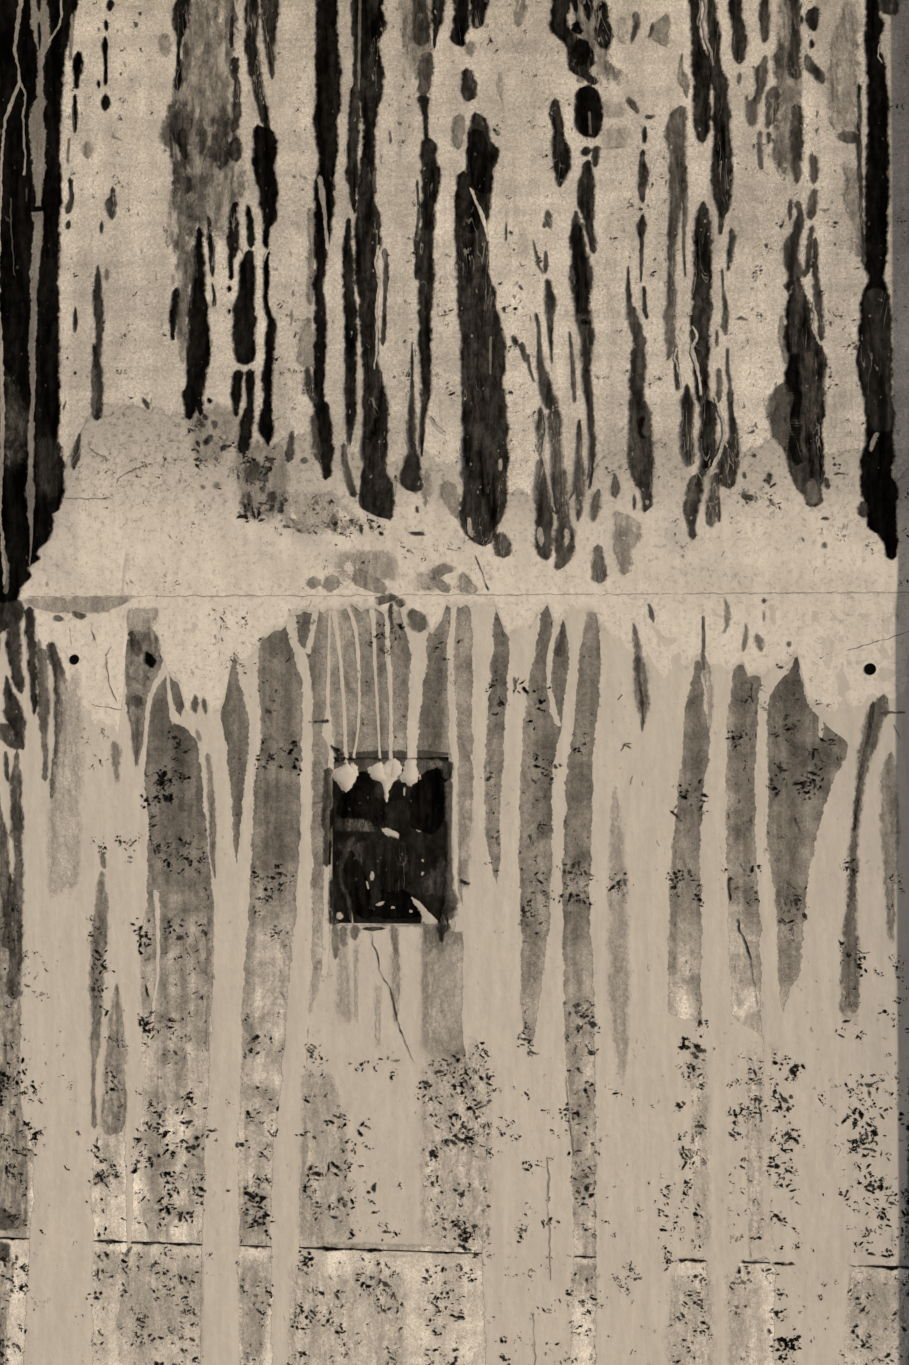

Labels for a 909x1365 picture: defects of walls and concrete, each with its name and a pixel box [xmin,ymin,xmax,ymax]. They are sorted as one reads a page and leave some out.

damp [0,0,38,432]
damp [227,201,257,365]
damp [244,0,271,129]
damp [252,124,279,249]
damp [341,218,358,446]
damp [431,0,490,101]
damp [549,0,655,202]
damp [664,105,696,465]
damp [690,201,718,469]
damp [678,0,734,234]
damp [337,767,447,839]
crack [372,940,413,1060]